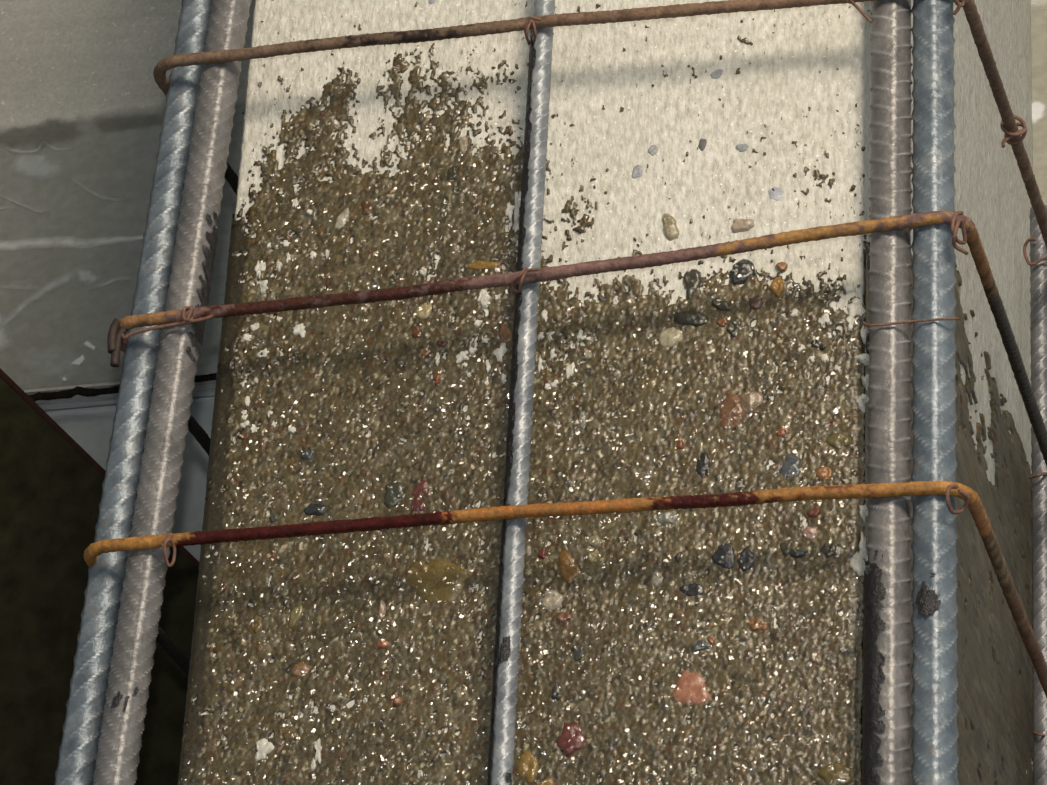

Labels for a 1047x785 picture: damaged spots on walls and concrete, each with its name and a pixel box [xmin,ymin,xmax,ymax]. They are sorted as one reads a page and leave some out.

spalling [94,0,1047,664]
spalling [177,495,1047,785]